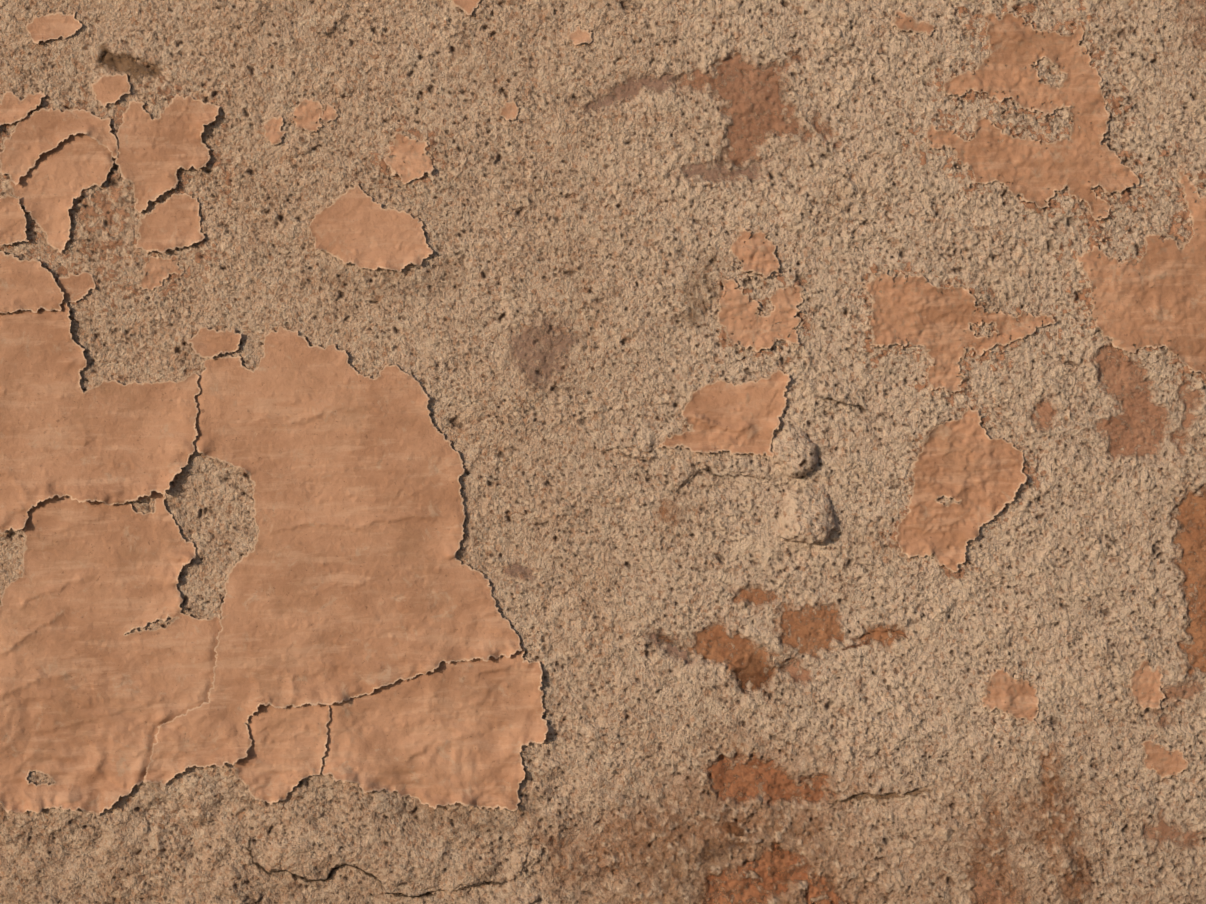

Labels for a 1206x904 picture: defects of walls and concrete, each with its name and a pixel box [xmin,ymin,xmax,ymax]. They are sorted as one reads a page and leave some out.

spalling [587,54,841,181]
peeling [657,227,817,458]
peeling [840,0,1206,579]
peeling [0,44,548,816]
spalling [643,588,844,692]
spalling [859,625,905,647]
spalling [1123,487,1206,779]
crack [246,839,436,898]
crack [465,880,507,888]